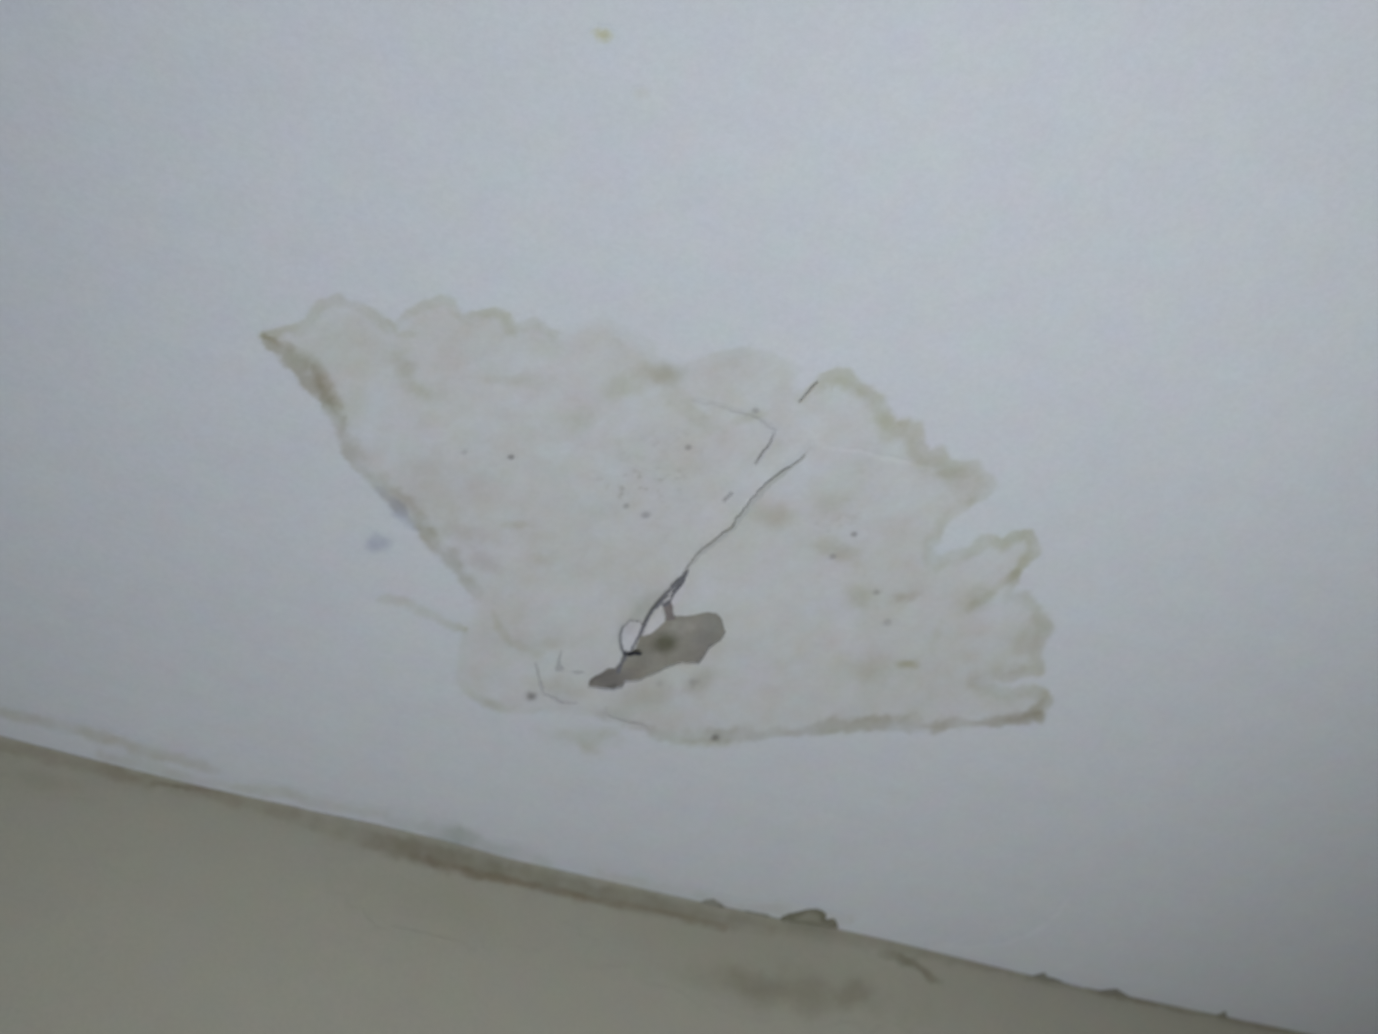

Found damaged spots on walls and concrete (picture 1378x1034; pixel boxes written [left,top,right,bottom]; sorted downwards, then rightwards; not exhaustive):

water stain [255,289,1058,762]
flaking render [588,580,725,689]
crack [535,432,806,733]
water stain [0,704,386,821]
water stain [407,849,987,1034]